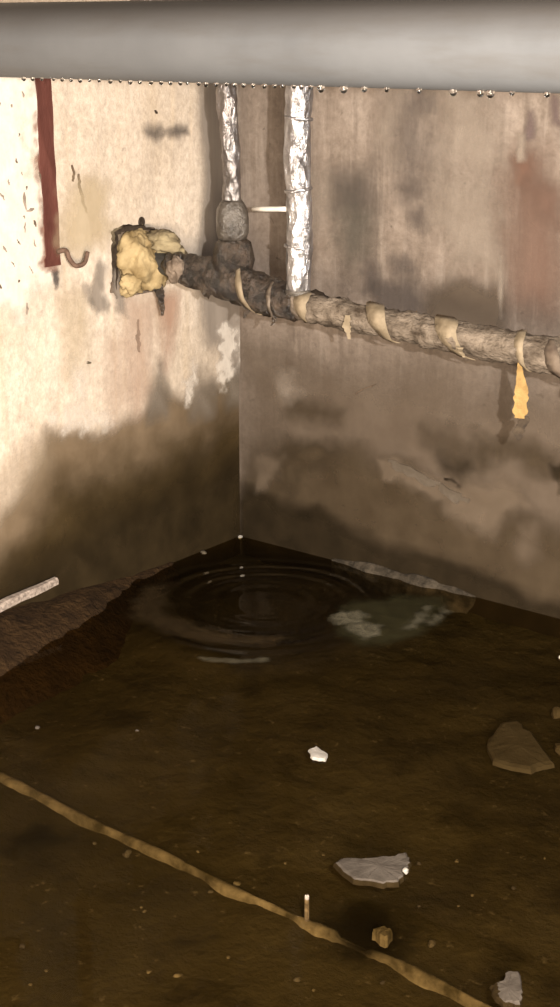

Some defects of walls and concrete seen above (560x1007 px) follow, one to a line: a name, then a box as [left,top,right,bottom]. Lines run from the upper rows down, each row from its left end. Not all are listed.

leakage [200,83,224,257]
leakage [366,266,505,328]
leakage [0,295,560,619]